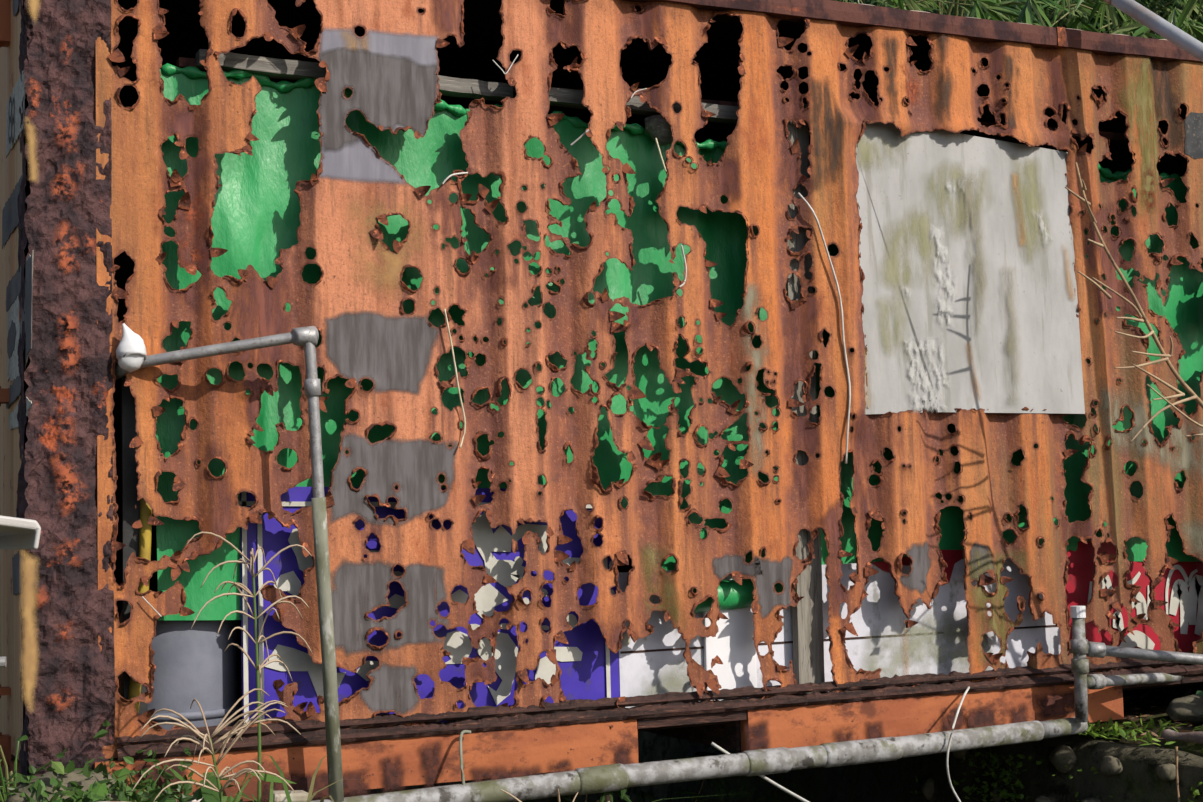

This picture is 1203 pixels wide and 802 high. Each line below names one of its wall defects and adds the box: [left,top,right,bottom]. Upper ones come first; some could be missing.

peeling [235,132,259,156]
rust [158,78,308,470]
rust [429,105,706,463]
rust [1060,123,1203,457]
rust [60,311,79,372]
peeling [325,491,335,507]
rust [753,335,970,691]
peeling [852,506,885,536]
peeling [1100,589,1168,643]
peeling [985,652,1003,665]
peeling [294,702,316,717]
rust [943,707,996,730]